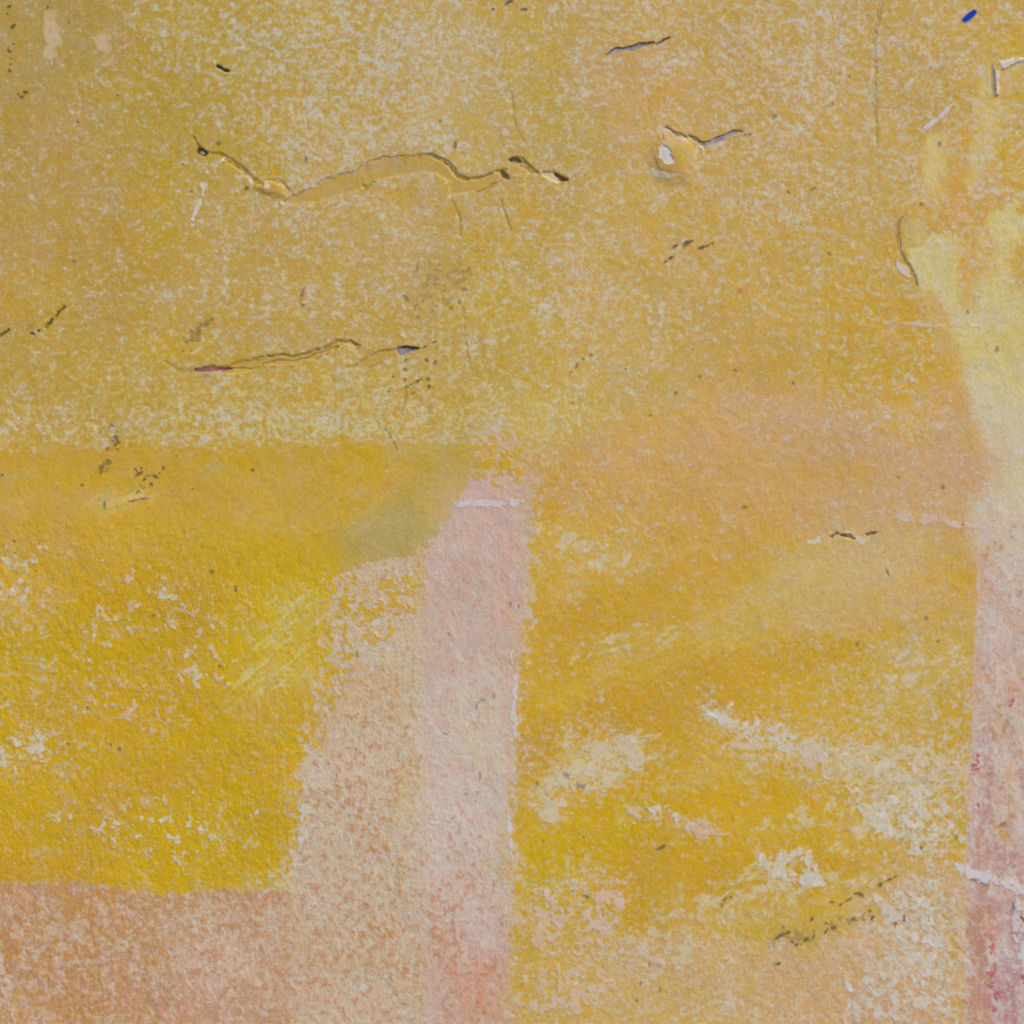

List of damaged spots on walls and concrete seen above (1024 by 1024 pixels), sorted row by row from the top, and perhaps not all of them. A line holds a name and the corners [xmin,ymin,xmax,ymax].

crack [192,91,569,234]
crack [163,339,360,378]
peeling [0,544,57,613]
peeling [329,558,425,650]
crack [803,524,877,548]
peeling [44,556,238,745]
peeling [0,728,68,779]
peeling [87,781,260,883]
peeling [531,734,656,825]
peeling [625,796,730,849]
peeling [696,697,982,1024]
peeling [495,864,730,1024]